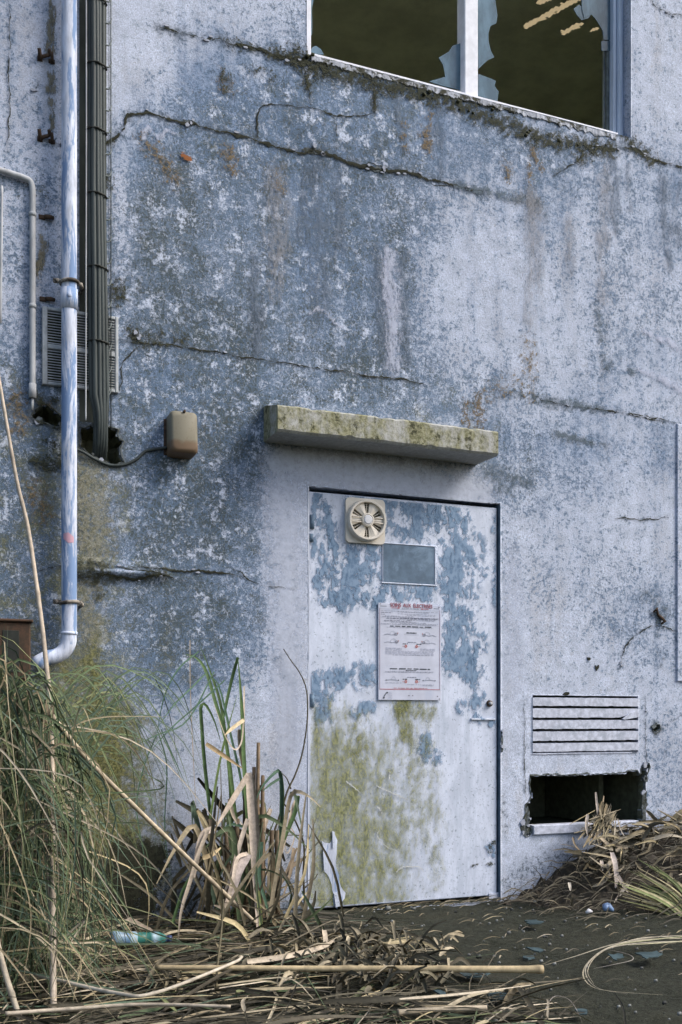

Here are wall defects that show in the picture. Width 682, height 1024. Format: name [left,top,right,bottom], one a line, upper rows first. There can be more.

crack [107,24,481,191]
crack [119,339,427,391]
spalling [30,403,61,429]
crack [536,396,677,423]
spalling [78,423,125,464]
crack [42,560,287,589]
peeling [257,444,505,816]
spalling [533,692,638,743]
spalling [520,762,651,837]